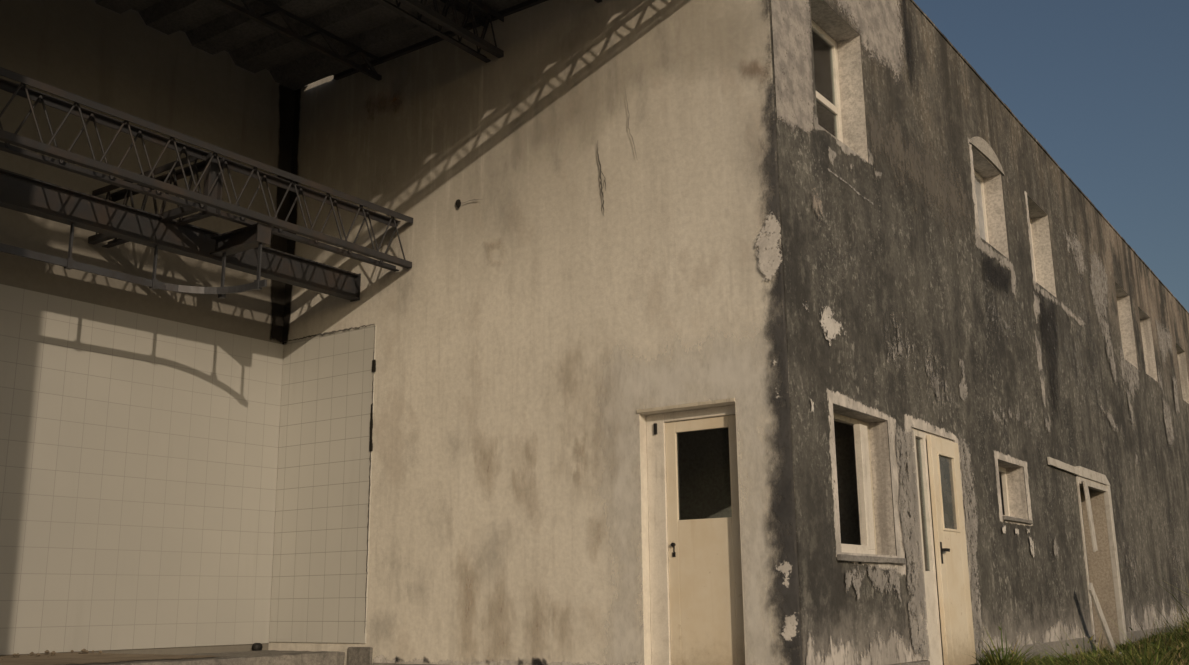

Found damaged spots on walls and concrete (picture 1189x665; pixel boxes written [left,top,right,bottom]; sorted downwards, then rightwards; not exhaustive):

water stain [903,0,913,85]
crack [597,147,606,215]
peeling [754,212,782,281]
water stain [983,261,1008,290]
spalling [803,304,845,346]
water stain [762,82,928,665]
water stain [1034,300,1058,406]
water stain [1099,319,1180,447]
spalling [776,560,793,588]
spalling [779,612,800,642]
water stain [980,619,1093,651]
water stain [1128,599,1189,632]